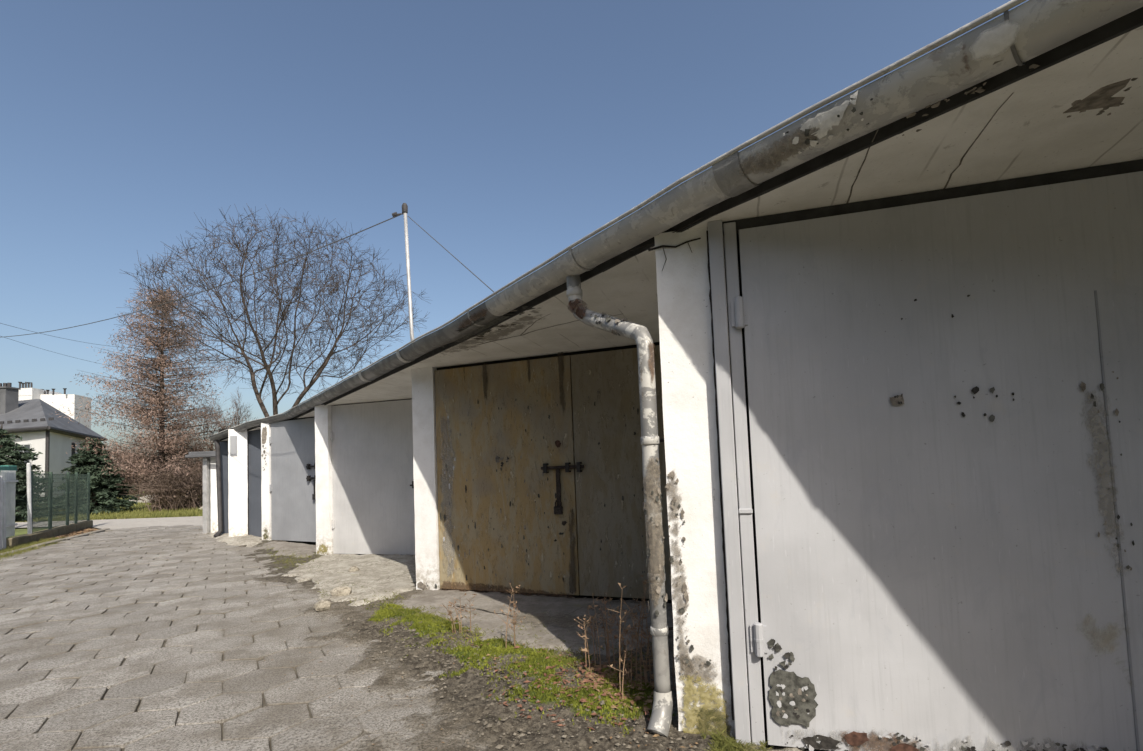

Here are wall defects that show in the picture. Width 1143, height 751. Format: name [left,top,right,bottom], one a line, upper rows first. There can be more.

peeling [783,91,873,154]
crack [846,129,879,203]
crack [943,93,1013,189]
peeling [1063,78,1137,118]
peeling [615,457,694,669]
damp [676,655,717,683]
peeling [767,639,861,751]
rust [841,731,927,751]
peeling [878,732,978,751]
peeling [992,741,1109,751]